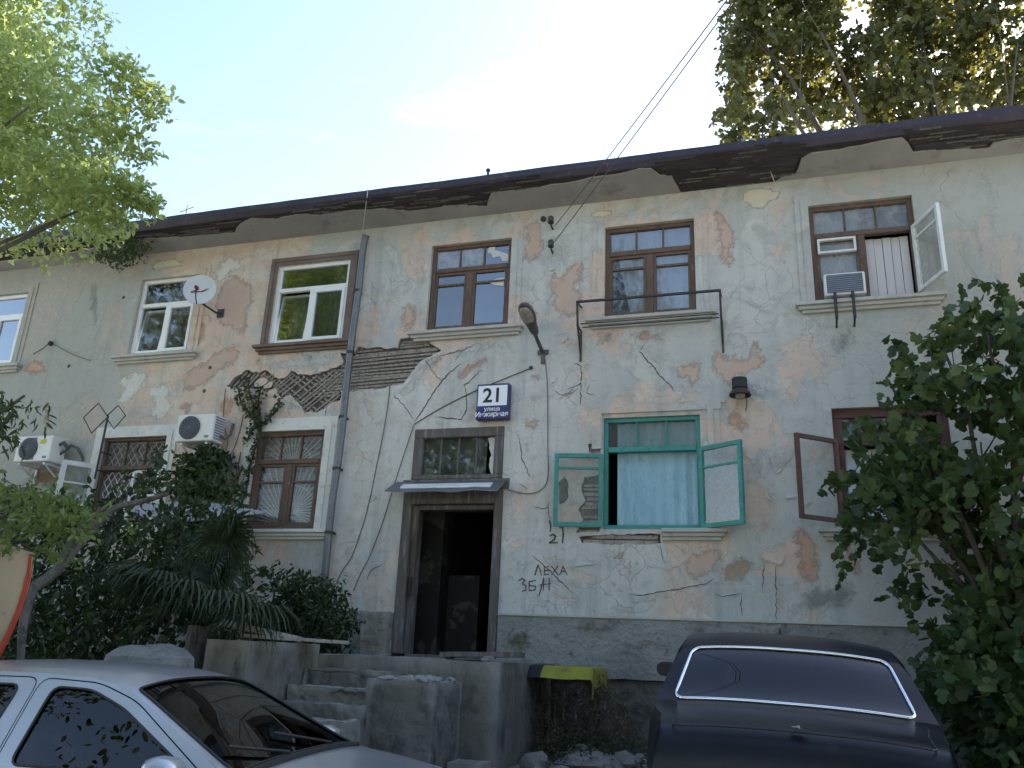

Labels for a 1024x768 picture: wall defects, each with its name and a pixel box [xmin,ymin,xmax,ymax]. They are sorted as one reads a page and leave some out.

peeling [215,257,253,331]
peeling [550,263,583,317]
peeling [117,344,238,419]
flaking render [220,304,441,414]
crack [394,346,480,422]
crack [639,342,674,390]
peeling [711,343,765,384]
crack [516,434,551,520]
crack [533,556,572,592]
crack [634,567,778,620]
peeling [793,529,819,581]